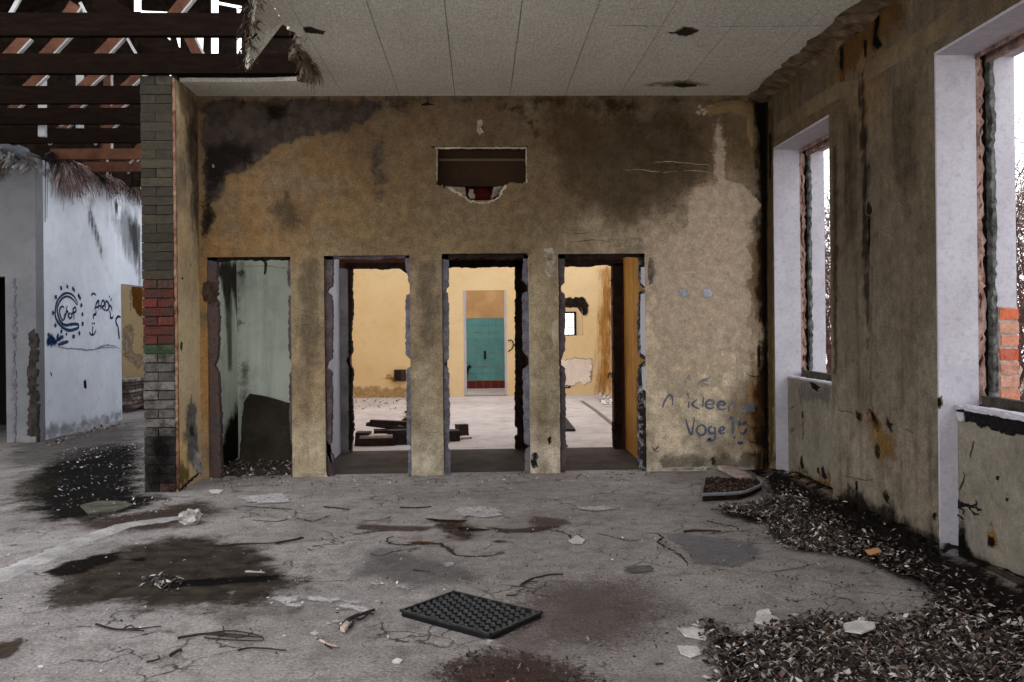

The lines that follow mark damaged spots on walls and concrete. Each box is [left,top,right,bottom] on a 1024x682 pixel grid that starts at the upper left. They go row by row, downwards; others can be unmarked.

leakage [191,96,406,234]
spalling [432,119,529,204]
crack [624,161,707,173]
leakage [115,199,140,265]
leakage [858,73,872,352]
flaking render [202,281,220,303]
flaking render [565,296,590,316]
leakage [730,98,779,493]
spalling [26,329,52,442]
leakage [218,261,247,465]
leakage [723,509,768,523]
flaking render [957,499,982,520]